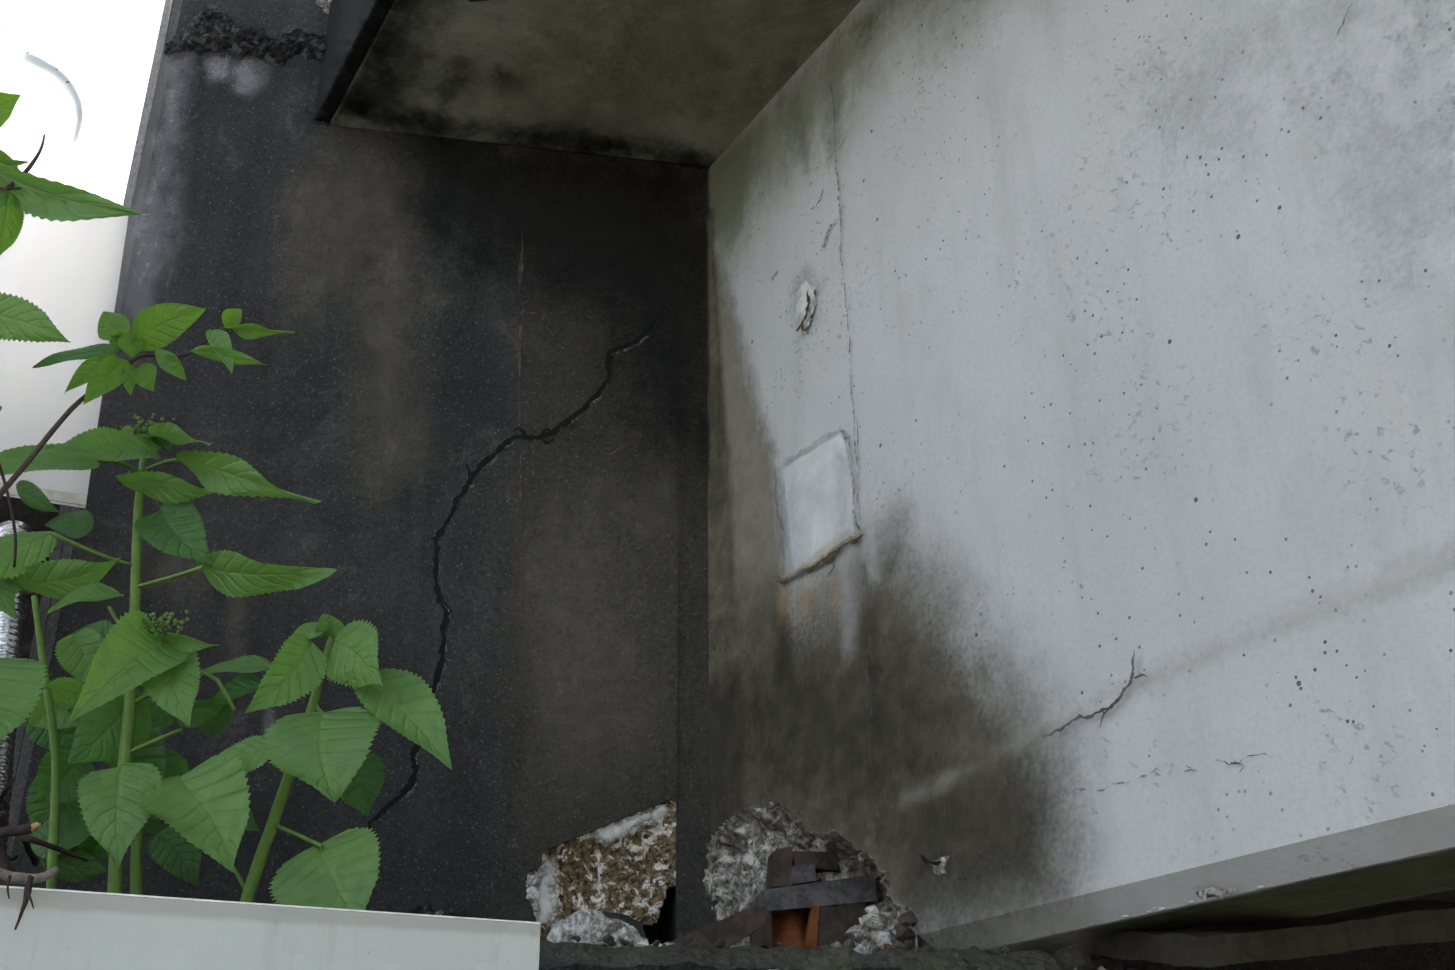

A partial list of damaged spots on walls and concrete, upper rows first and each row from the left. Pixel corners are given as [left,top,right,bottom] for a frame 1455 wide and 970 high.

crack [430,299,673,697]
crack [774,53,880,848]
damp [706,211,1060,927]
crack [1044,649,1147,736]
crack [368,743,423,832]
spalling [525,797,677,941]
corrosion [803,905,820,949]
spalling [703,799,925,951]
spalling [842,934,874,955]